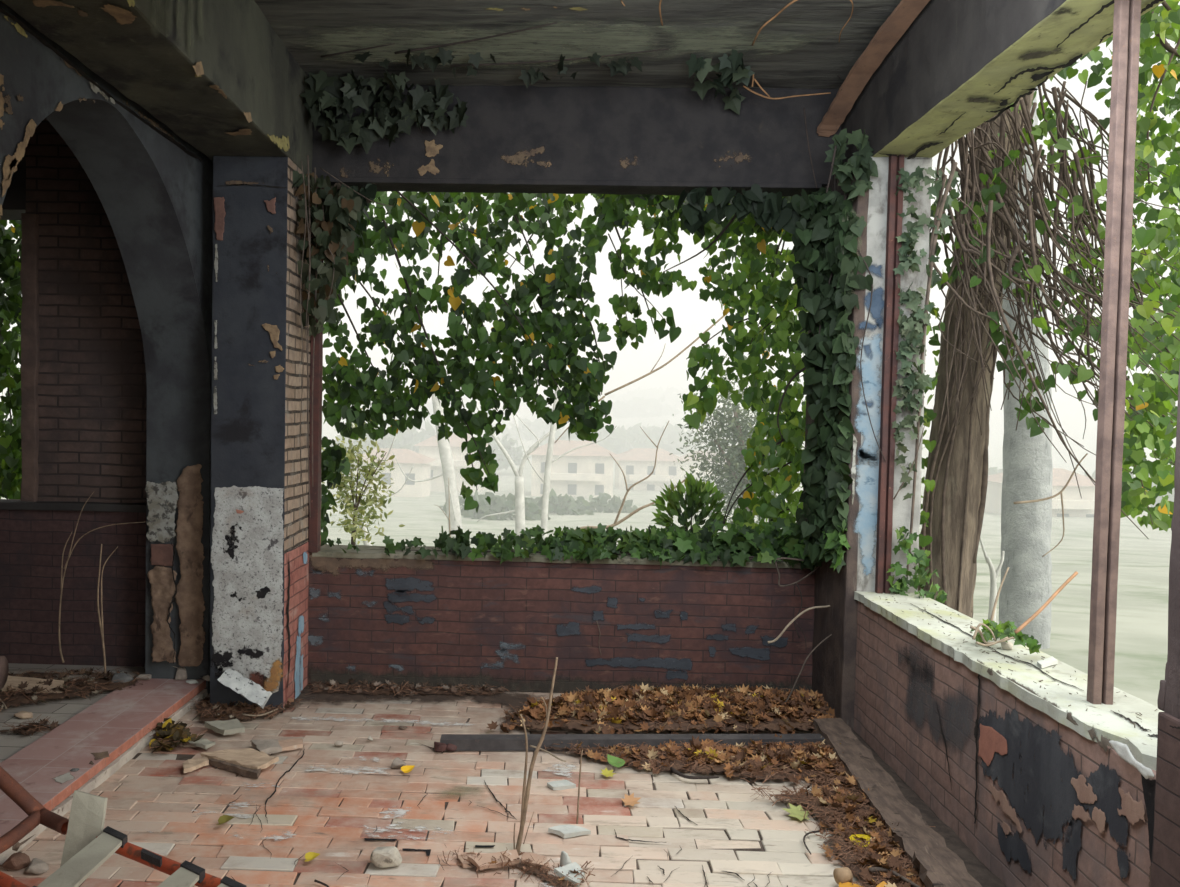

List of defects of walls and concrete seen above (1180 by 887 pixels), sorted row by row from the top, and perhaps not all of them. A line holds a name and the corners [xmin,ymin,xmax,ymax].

spalling [100,0,136,25]
crack [1141,0,1164,13]
peeling [0,74,24,130]
crack [879,0,1114,159]
peeling [0,119,37,219]
peeling [417,140,443,176]
peeling [501,146,552,168]
peeling [145,464,284,693]
peeling [898,648,1154,881]